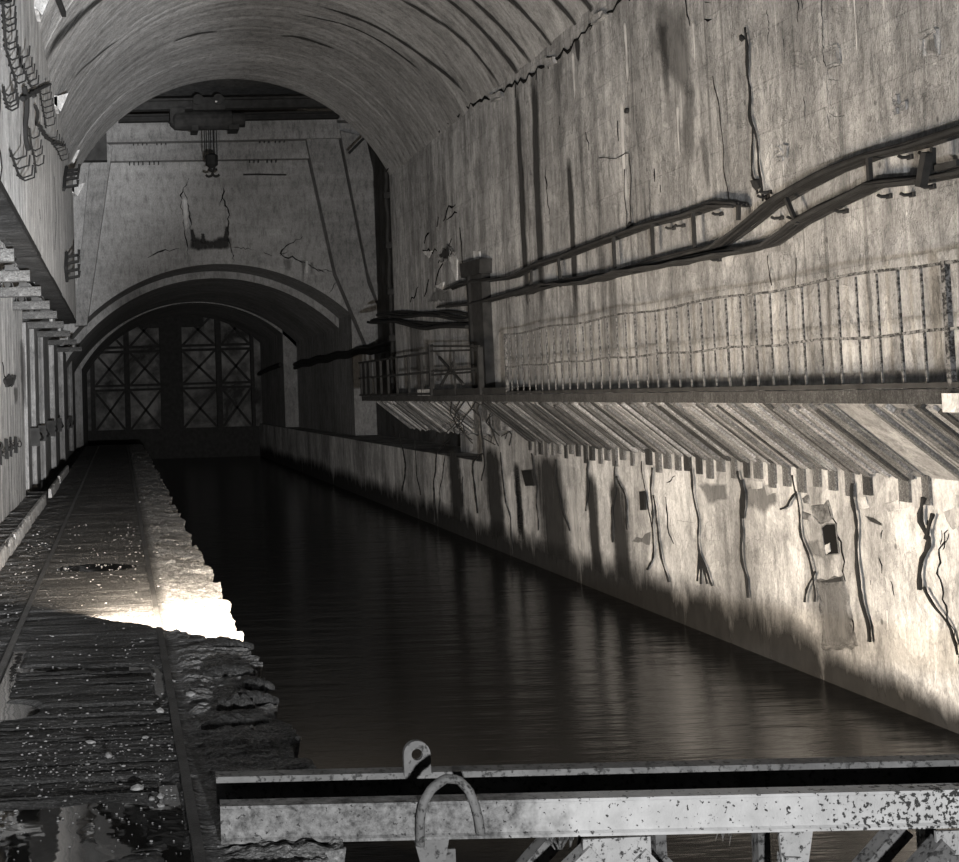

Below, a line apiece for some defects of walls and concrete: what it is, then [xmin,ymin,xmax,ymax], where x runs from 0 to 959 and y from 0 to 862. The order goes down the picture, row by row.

crack [438,0,630,133]
crack [148,179,335,293]
spalling [802,495,858,650]
crack [936,530,959,664]